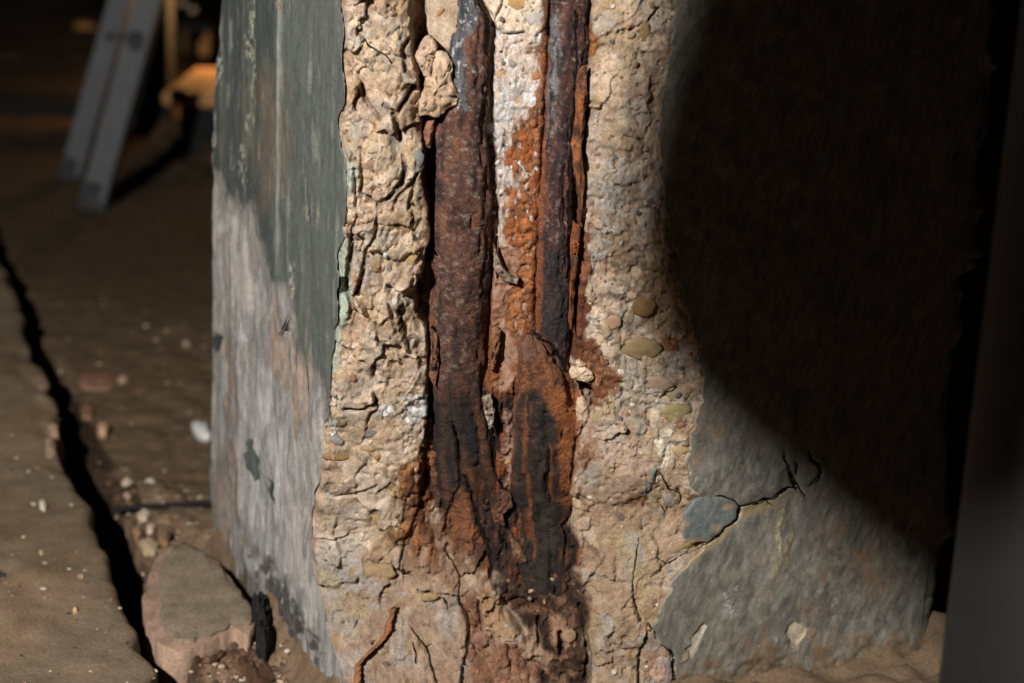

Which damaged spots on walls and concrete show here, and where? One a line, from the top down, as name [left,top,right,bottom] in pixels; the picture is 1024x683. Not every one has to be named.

rust [587,21,598,56]
rust [493,33,549,337]
spalling [191,0,739,683]
rust [571,232,622,409]
crack [398,414,528,683]
rust [471,644,540,683]
crack [632,450,822,683]